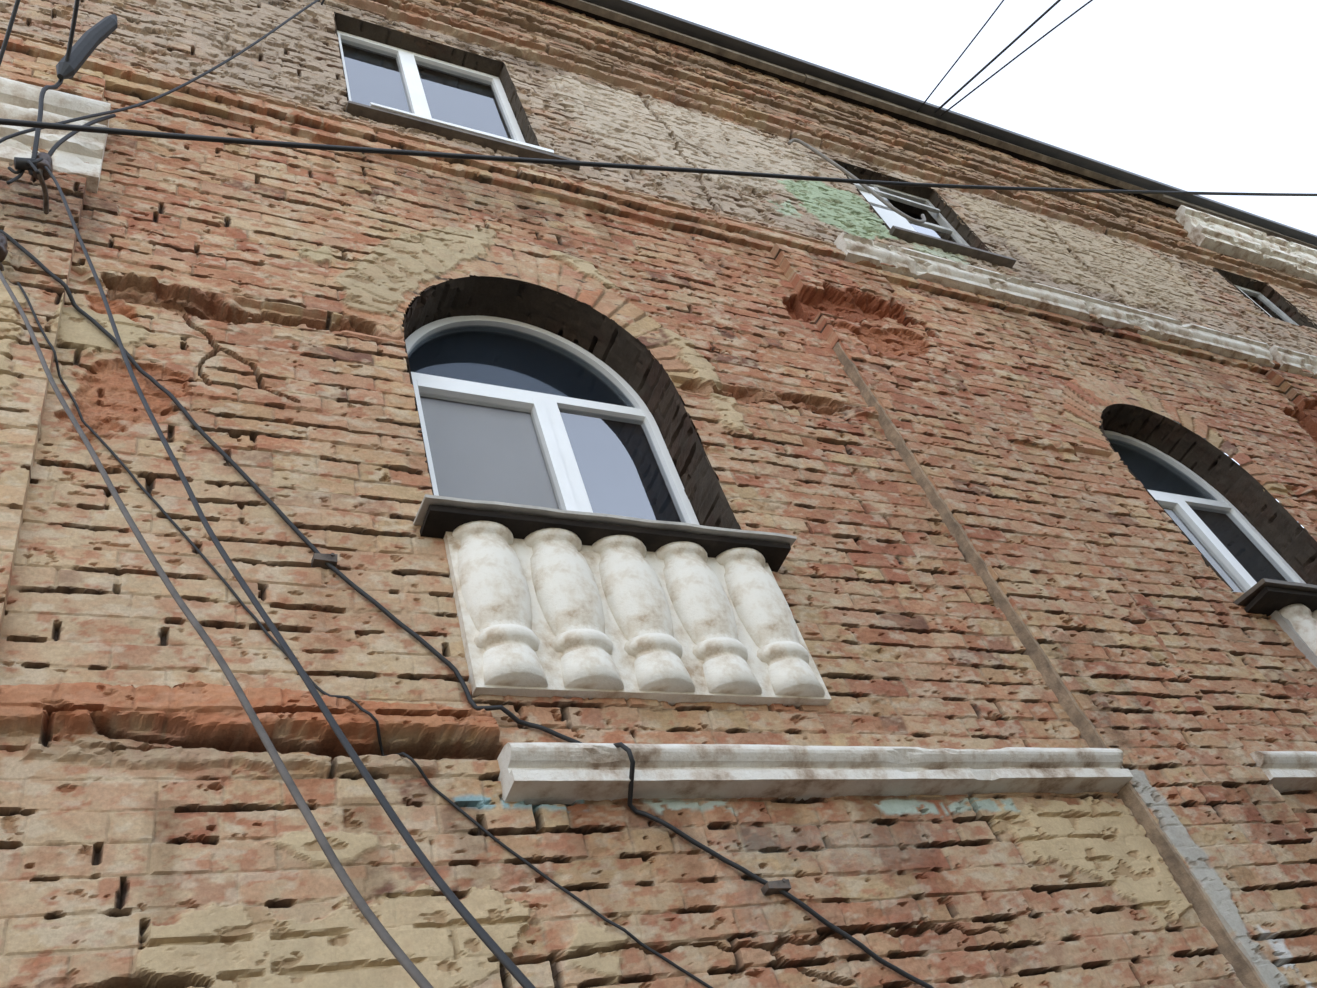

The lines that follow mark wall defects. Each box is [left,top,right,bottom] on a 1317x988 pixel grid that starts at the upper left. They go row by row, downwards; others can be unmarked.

spalling [782,282,938,358]
spalling [1283,395,1317,442]
spalling [0,977,79,988]